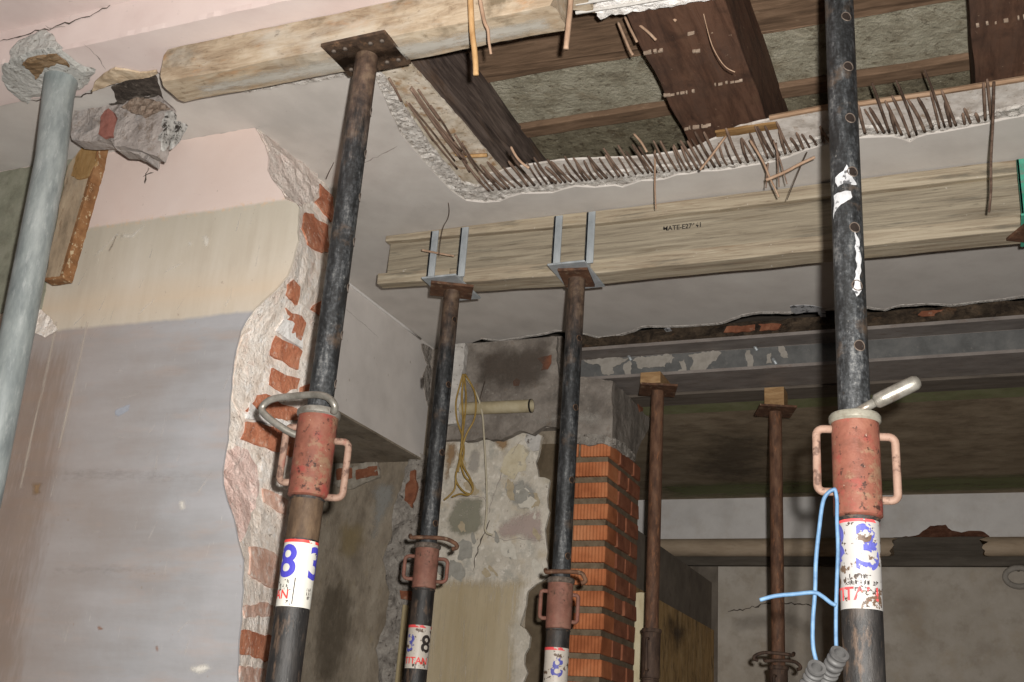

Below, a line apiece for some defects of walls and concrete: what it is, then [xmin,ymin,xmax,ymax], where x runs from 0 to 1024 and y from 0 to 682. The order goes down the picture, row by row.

crack [1,5,110,41]
spalling [71,67,188,169]
spalling [376,62,829,202]
spalling [858,69,1024,141]
spalling [260,134,334,253]
spalling [582,305,835,376]
spalling [867,296,1024,326]
spalling [224,280,321,589]
peeling [525,434,542,452]
flaking render [376,453,428,682]
flaking render [438,521,476,582]
spalling [238,602,273,682]